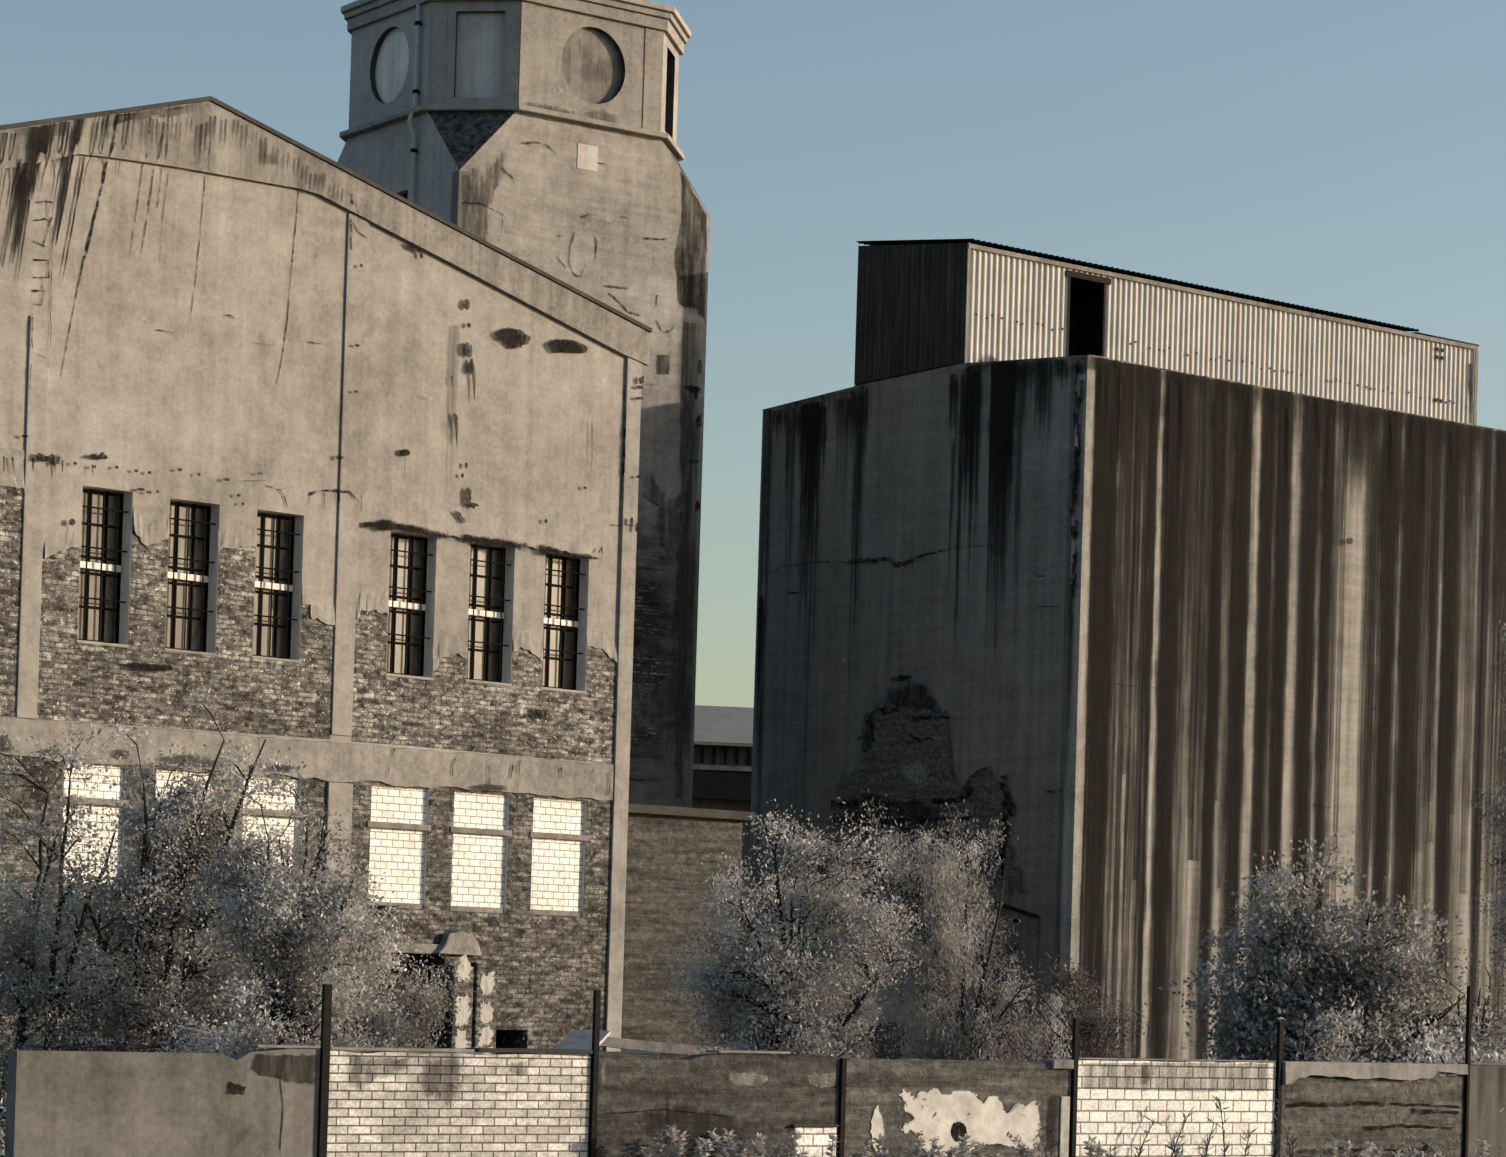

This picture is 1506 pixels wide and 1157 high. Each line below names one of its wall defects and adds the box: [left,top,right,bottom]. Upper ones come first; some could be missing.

leakage [0,112,343,276]
leakage [675,173,707,318]
spalling [495,327,530,349]
spalling [548,339,589,354]
leakage [774,403,826,548]
spalling [0,452,160,717]
spalling [37,512,335,739]
spalling [352,517,679,764]
crack [770,544,1004,595]
spalling [829,675,1029,899]
leakage [949,355,1506,1062]
peeling [870,1088,1046,1157]